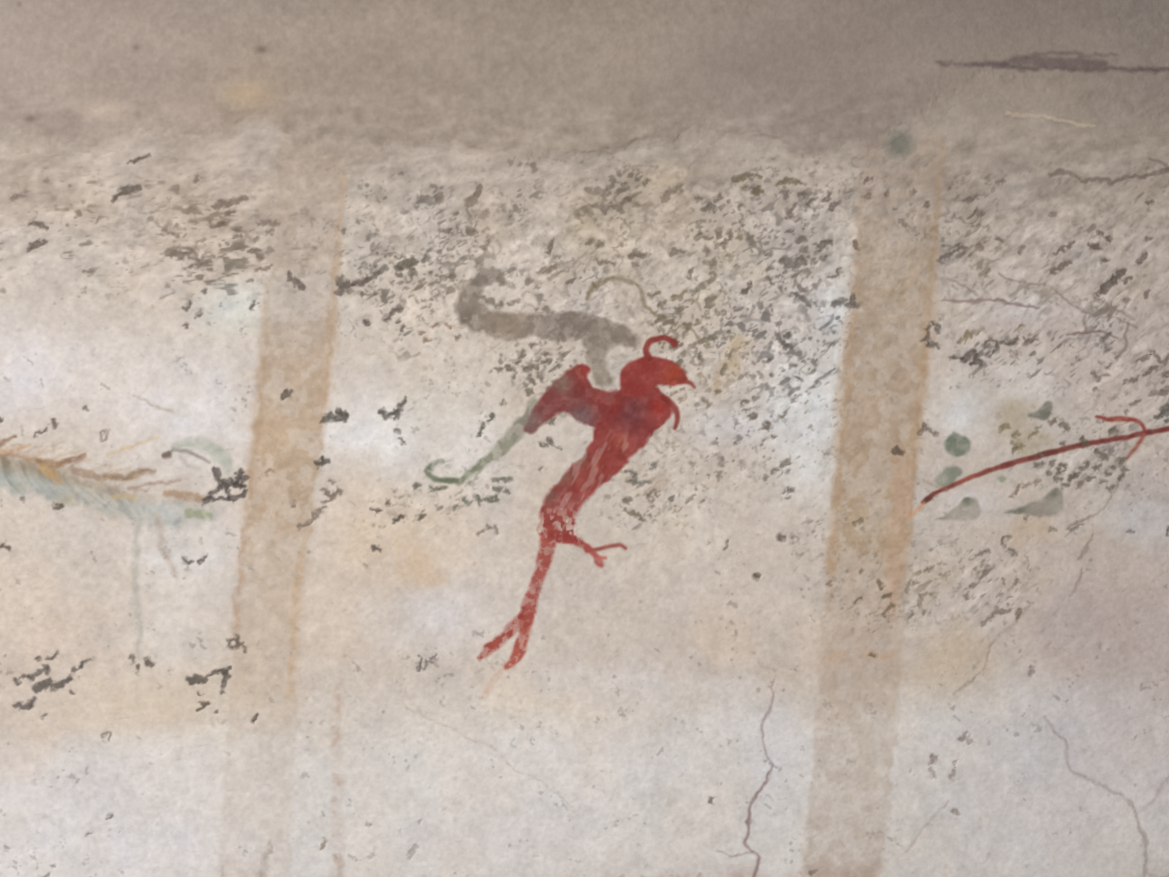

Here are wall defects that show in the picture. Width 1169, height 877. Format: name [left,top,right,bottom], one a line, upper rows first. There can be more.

spalling [584,171,841,221]
spalling [333,252,456,298]
spalling [1050,229,1155,308]
spalling [492,342,564,397]
spalling [919,320,1040,368]
spalling [1089,343,1169,427]
spalling [318,407,351,425]
spalling [376,395,408,447]
spalling [998,417,1131,500]
spalling [411,475,515,513]
crack [716,677,779,877]
crack [1043,715,1169,877]